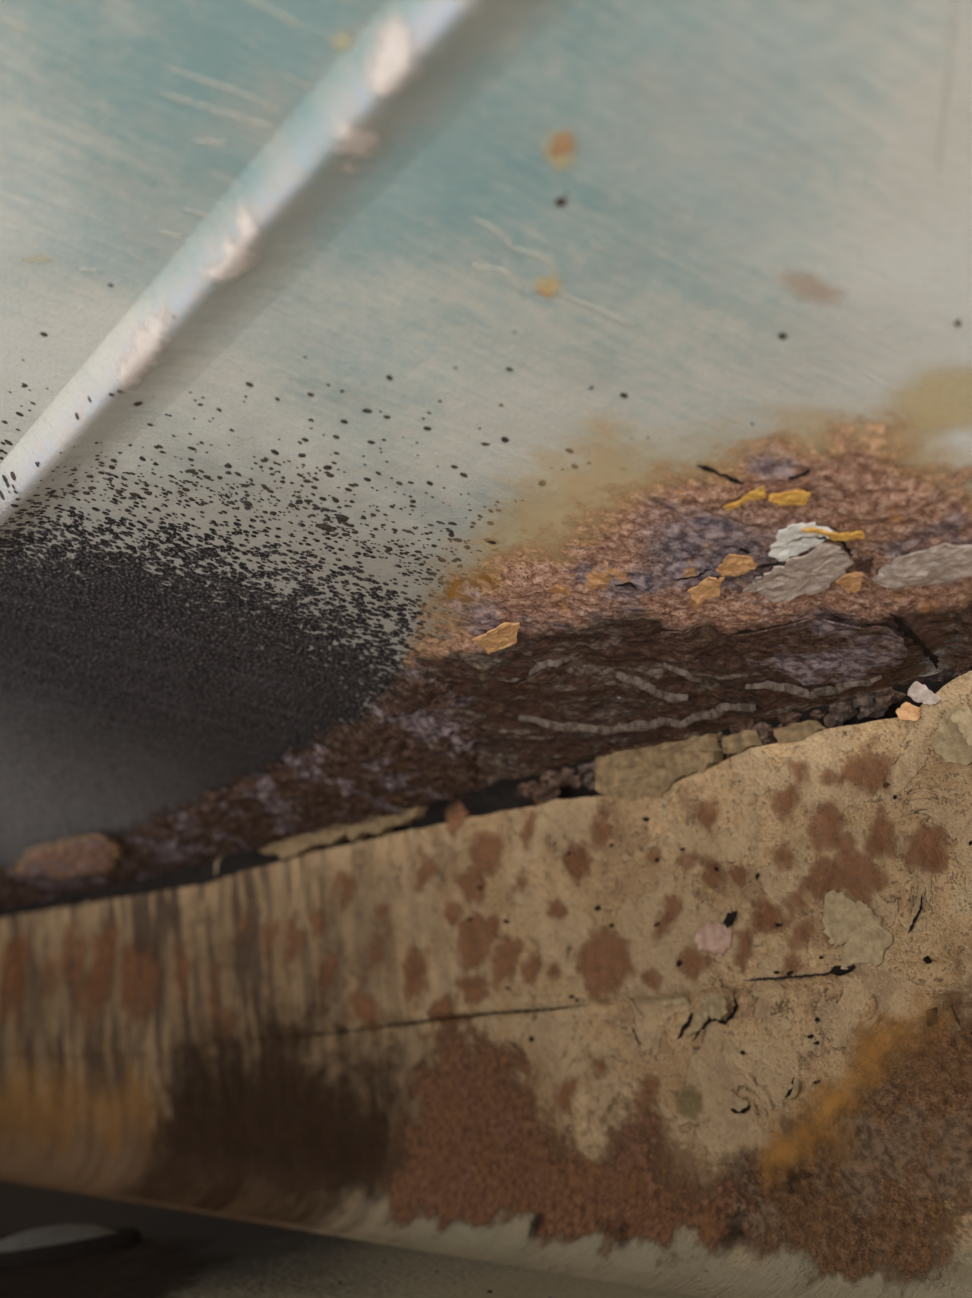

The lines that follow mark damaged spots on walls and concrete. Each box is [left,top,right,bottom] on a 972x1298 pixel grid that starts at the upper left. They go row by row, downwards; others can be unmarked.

peeling [368,19,419,96]
peeling [334,122,379,171]
peeling [205,207,258,281]
peeling [117,315,167,392]
corrosion [0,422,972,909]
corrosion [734,803,946,975]
crack [744,964,855,981]
crack [293,1003,592,1054]
corrosion [129,833,972,1295]